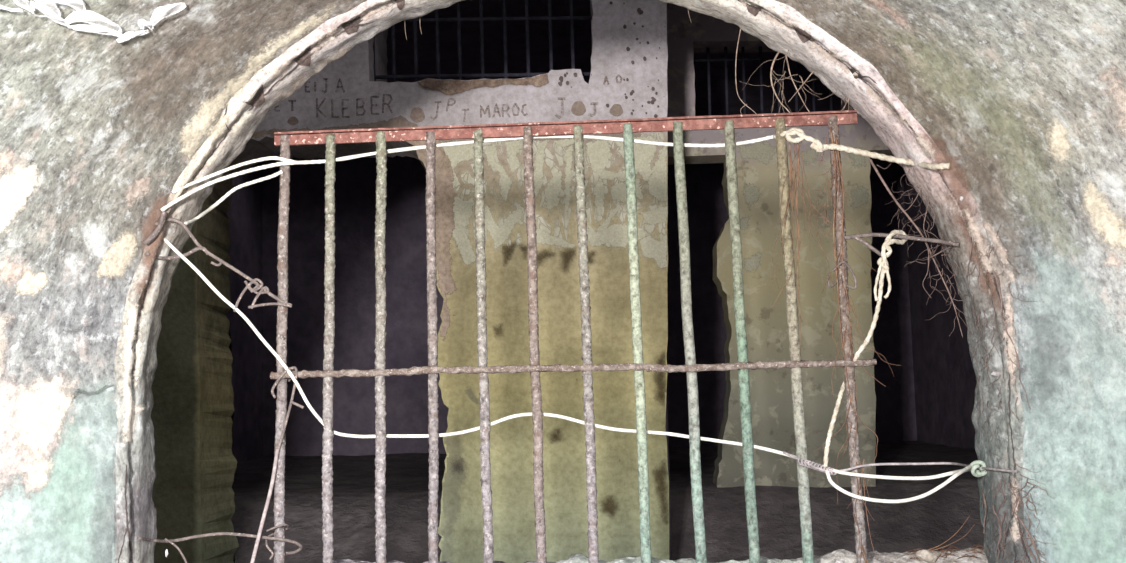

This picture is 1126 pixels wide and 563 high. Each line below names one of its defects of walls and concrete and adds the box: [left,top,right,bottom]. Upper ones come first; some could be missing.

spalling [610,1,660,64]
spalling [418,72,577,95]
peeling [571,101,586,116]
peeling [606,78,659,118]
spalling [0,149,41,234]
peeling [127,176,152,207]
peeling [0,258,48,296]
peeling [97,232,138,278]
peeling [408,132,668,341]
peeling [120,305,145,442]
spalling [0,313,78,498]